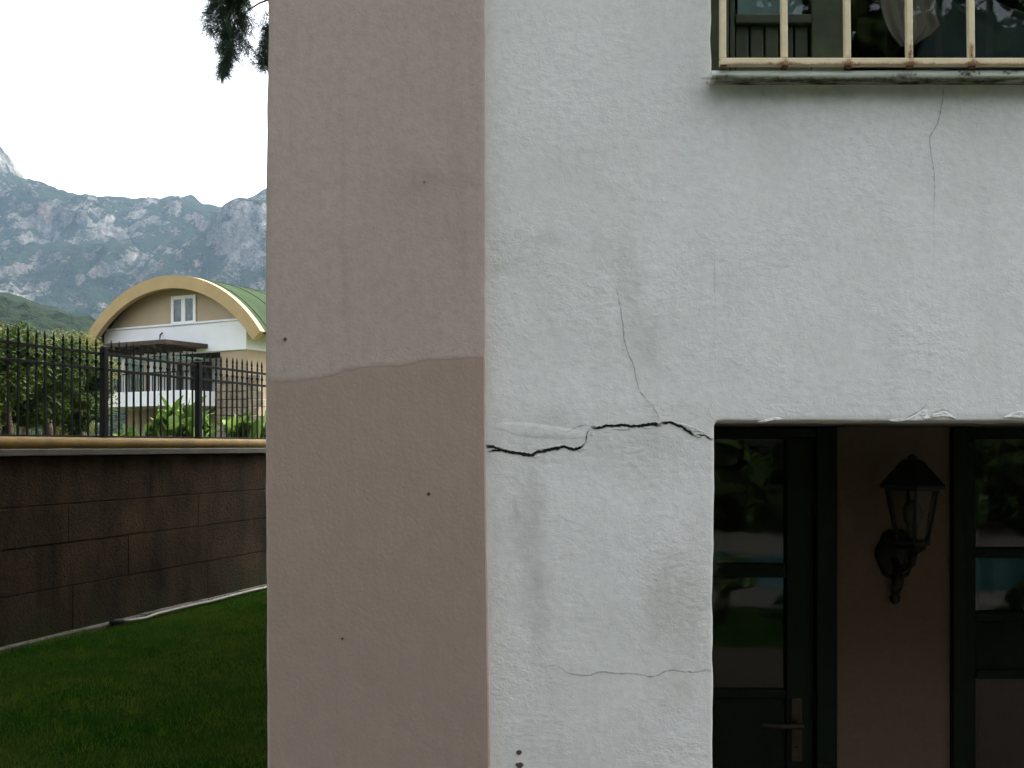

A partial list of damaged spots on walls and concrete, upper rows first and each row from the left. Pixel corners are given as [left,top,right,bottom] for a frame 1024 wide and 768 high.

flaking render [889,409,955,422]
flaking render [1003,411,1024,419]
crack [486,421,712,458]